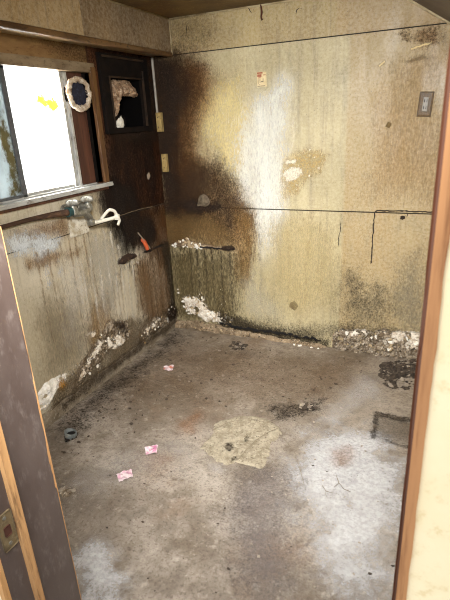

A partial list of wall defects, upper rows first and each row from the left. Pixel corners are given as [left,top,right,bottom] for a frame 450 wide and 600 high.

leakage [186,77,290,239]
peeling [281,149,326,197]
leakage [58,331,183,431]
leakage [51,214,403,410]
flaking render [332,328,420,360]
leakage [226,411,410,600]